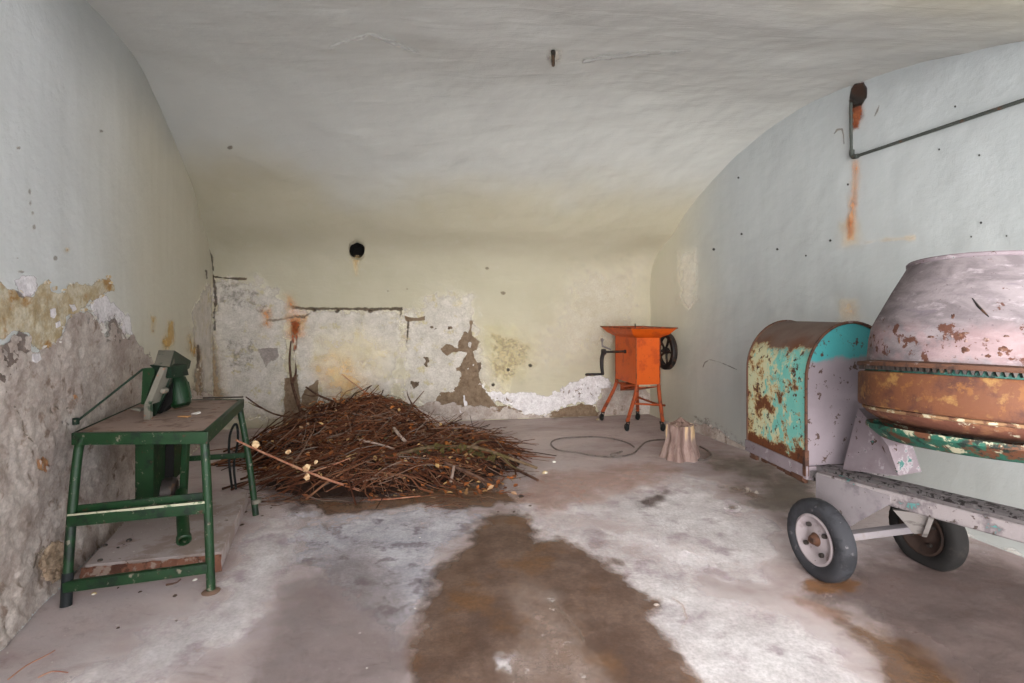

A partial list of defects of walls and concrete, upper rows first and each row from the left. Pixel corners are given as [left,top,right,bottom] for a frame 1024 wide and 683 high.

rust [853,105,862,129]
spalling [0,275,222,650]
peeling [191,279,319,424]
rust [291,318,300,351]
efflorescence [480,375,611,417]
damp [525,479,856,683]